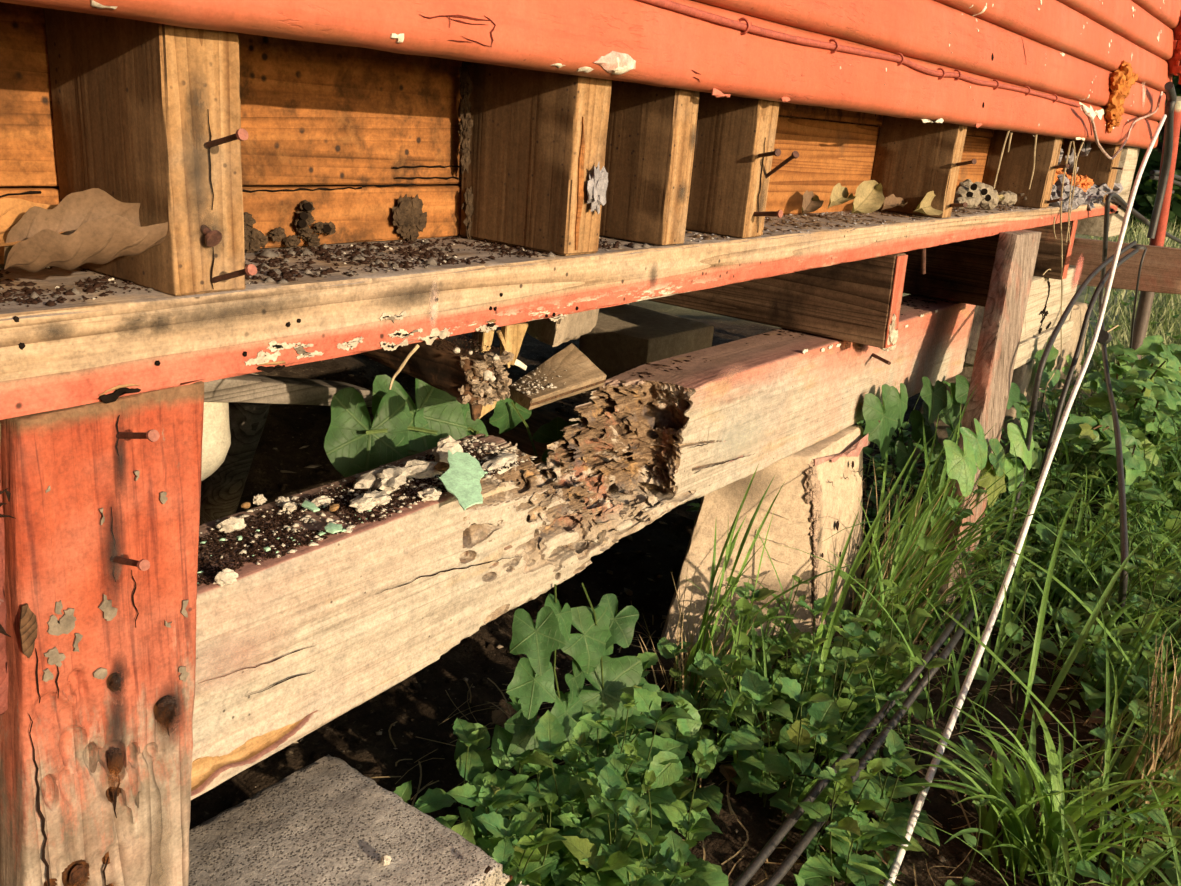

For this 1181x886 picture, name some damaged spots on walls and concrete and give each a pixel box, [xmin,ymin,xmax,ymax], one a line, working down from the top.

crack [419,14,496,47]
peeling [379,311,453,351]
peeling [475,320,498,333]
peeling [245,336,378,375]
peeling [514,413,673,550]
peeling [98,594,118,621]
peeling [164,599,189,628]
corrosion [158,696,174,729]
crack [0,624,59,886]
corrosion [69,865,87,886]